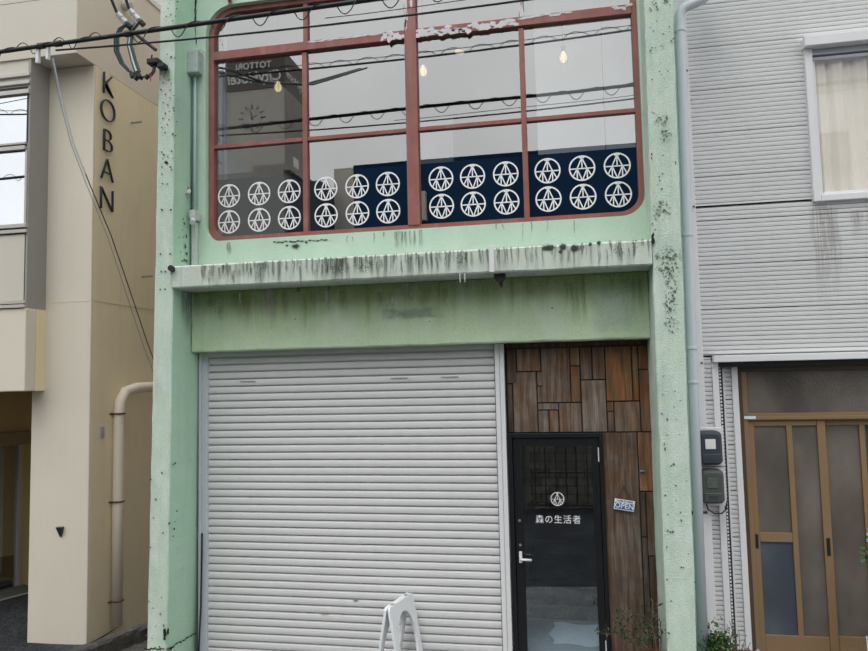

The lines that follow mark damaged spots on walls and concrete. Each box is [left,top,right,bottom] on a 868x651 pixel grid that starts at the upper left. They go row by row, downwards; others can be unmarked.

damp [201,250,467,280]
damp [478,240,680,333]
crack [144,633,197,650]